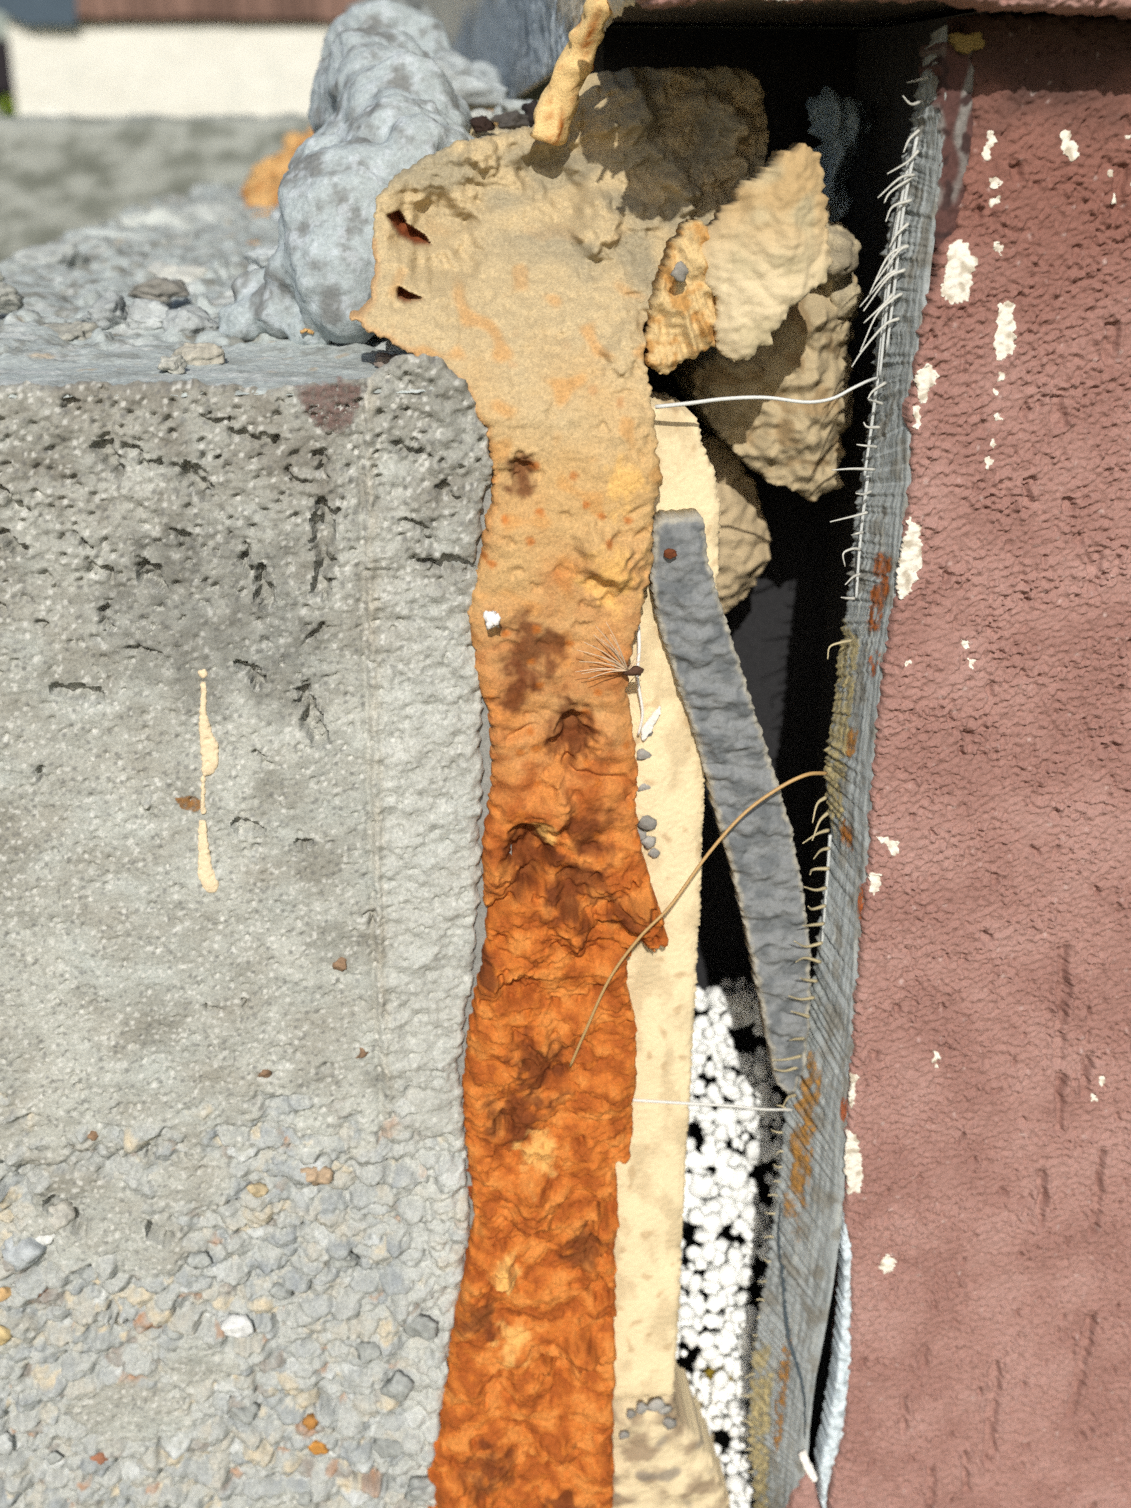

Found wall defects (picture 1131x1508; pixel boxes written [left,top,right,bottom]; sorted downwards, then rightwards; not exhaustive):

peeling [912,363,939,429]
peeling [895,516,923,599]
peeling [961,640,976,669]
peeling [876,836,900,856]
peeling [868,872,882,896]
peeling [848,1072,860,1109]
peeling [843,1129,864,1194]
peeling [878,1254,897,1274]
crack [778,1202,852,1508]